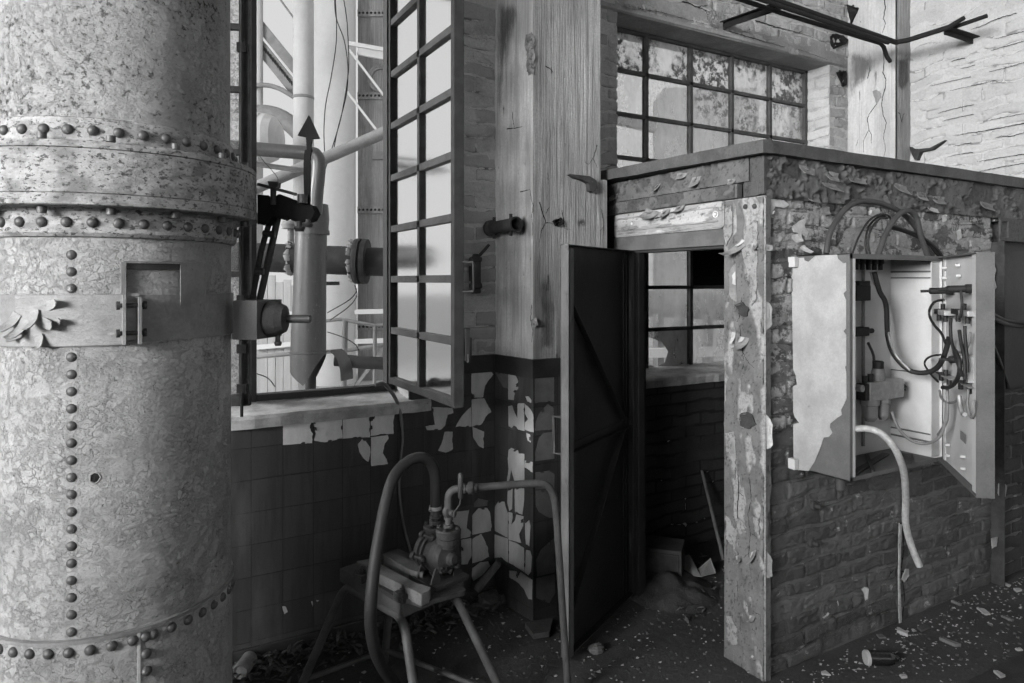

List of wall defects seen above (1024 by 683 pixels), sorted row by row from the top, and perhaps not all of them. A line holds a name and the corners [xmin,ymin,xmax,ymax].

crack [856,0,904,152]
peeling [675,173,701,187]
peeling [771,199,789,215]
peeling [799,165,867,215]
peeling [894,183,948,222]
peeling [792,218,814,253]
peeling [730,332,749,350]
peeling [283,414,395,466]
peeling [725,412,773,480]
peeling [426,372,555,603]
peeling [725,516,773,578]
peeling [726,615,755,646]